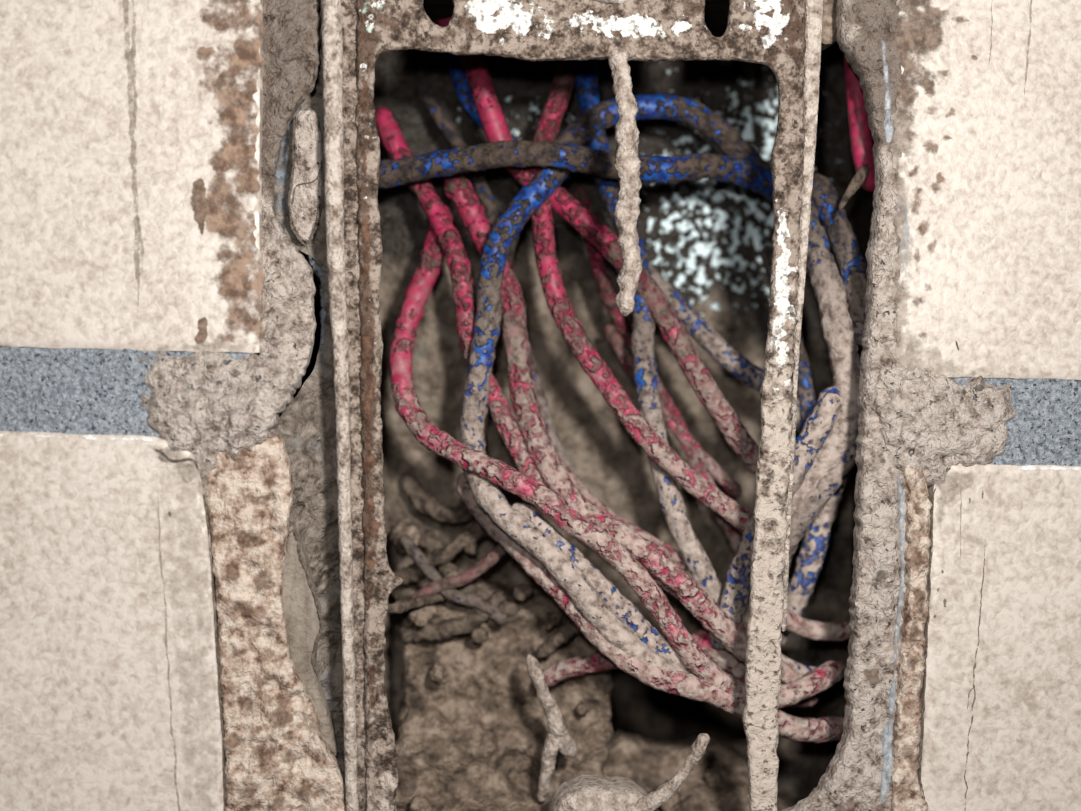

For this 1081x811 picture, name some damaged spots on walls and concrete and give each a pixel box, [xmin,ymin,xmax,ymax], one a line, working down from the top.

spalling [191,0,265,344]
peeling [289,108,325,244]
spalling [293,276,323,398]
peeling [237,530,262,546]
peeling [248,474,276,506]
crack [154,448,228,811]
peeling [234,601,251,617]
peeling [238,696,253,709]
peeling [256,746,295,762]
peeling [255,529,338,756]
spalling [911,589,925,641]
crack [919,489,986,811]